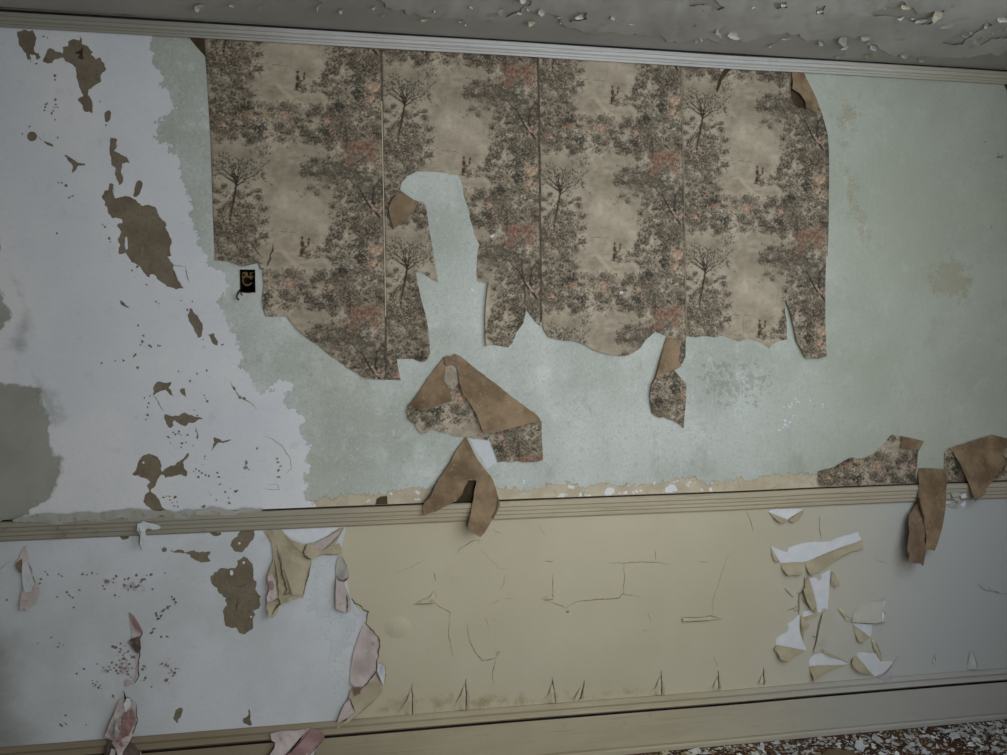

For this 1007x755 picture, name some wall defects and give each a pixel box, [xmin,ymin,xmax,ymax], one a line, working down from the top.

peeling [372,0,1007,63]
flaking render [0,27,386,747]
flaking render [469,438,497,469]
peeling [653,480,713,493]
peeling [769,509,803,524]
peeling [946,492,967,509]
crack [396,528,512,682]
crack [543,552,668,631]
peeling [771,532,898,681]